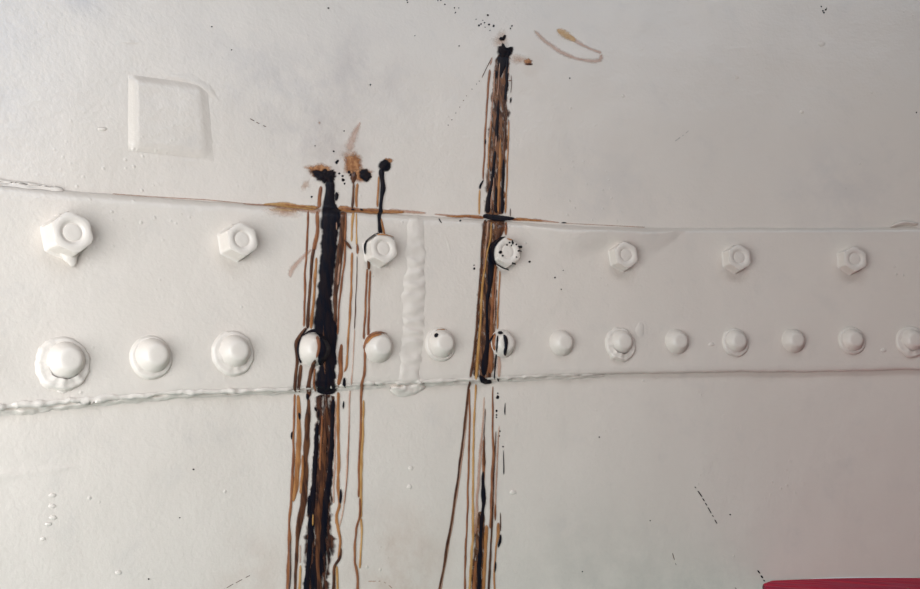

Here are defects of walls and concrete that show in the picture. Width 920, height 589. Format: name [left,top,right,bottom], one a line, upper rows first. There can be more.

corrosion [247,35,566,589]